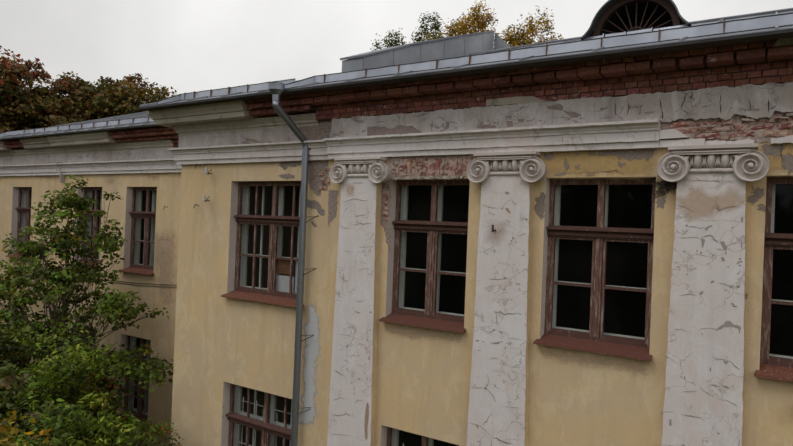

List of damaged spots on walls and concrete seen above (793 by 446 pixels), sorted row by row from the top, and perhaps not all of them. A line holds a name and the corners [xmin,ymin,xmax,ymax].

flaking render [661,112,793,175]
flaking render [279,161,338,227]
flaking render [380,155,477,248]
crack [678,203,743,261]
crack [466,192,527,445]
crack [668,280,741,336]
crack [667,357,739,404]